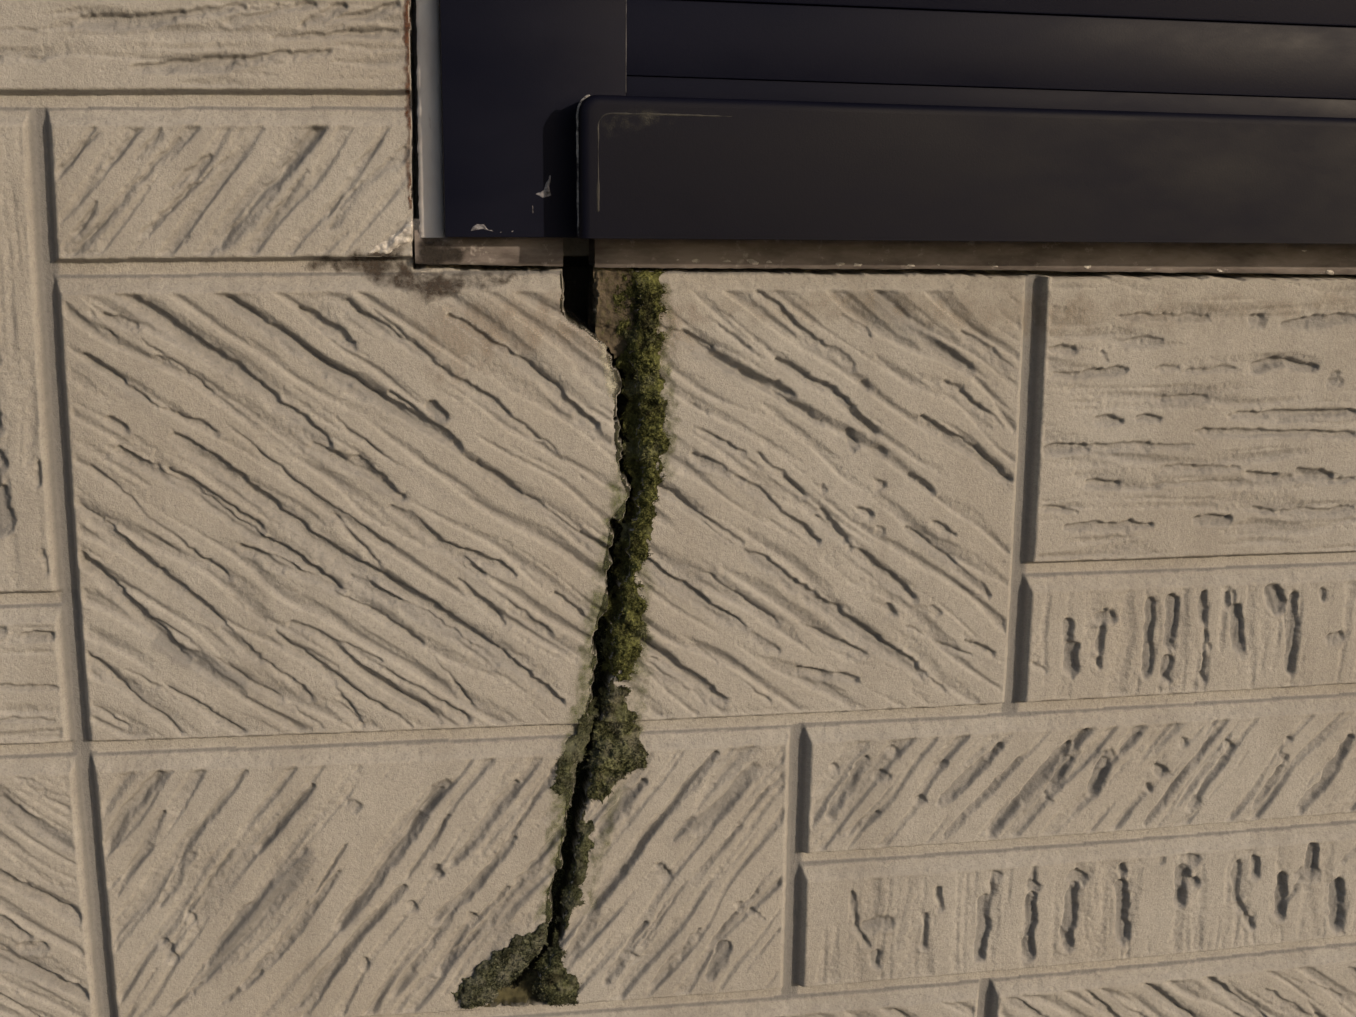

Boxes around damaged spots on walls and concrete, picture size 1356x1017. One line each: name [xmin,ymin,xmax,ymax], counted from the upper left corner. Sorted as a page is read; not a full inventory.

crack [451,257,671,1010]
water stain [600,344,616,394]